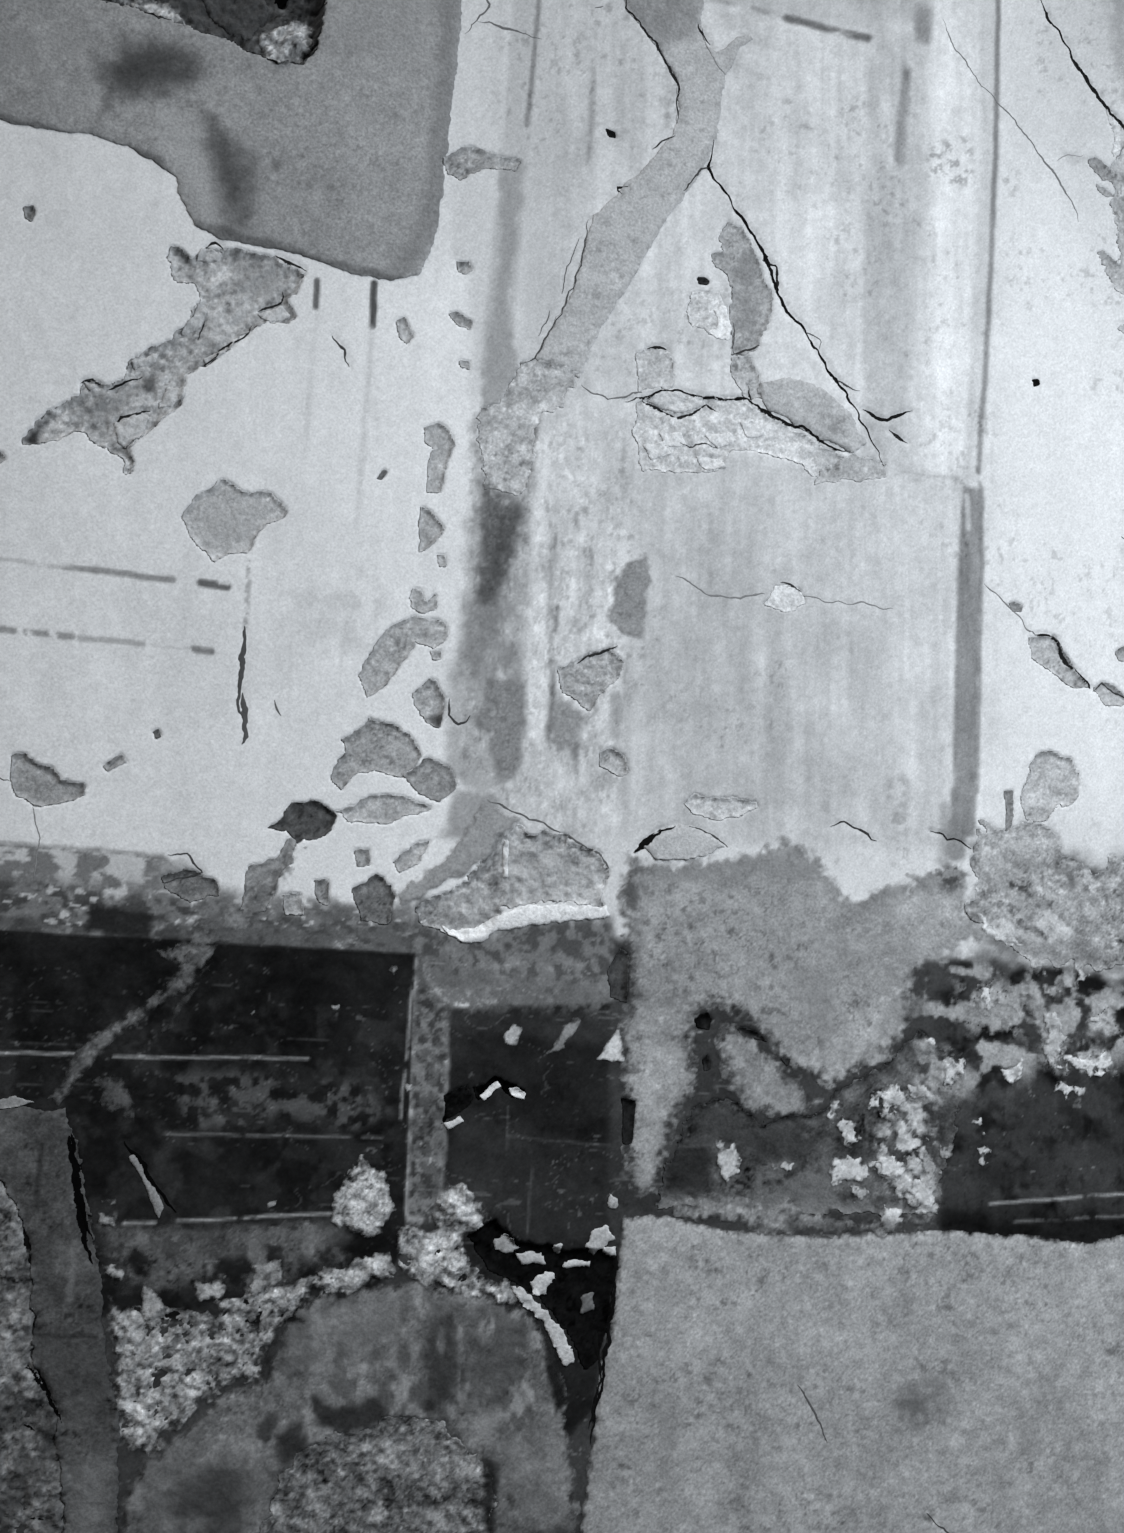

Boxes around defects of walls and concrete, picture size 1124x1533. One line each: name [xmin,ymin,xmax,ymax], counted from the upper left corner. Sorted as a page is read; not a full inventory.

crack [466,0,540,39]
crack [595,0,680,149]
crack [944,0,1124,219]
flaking render [22,241,306,475]
crack [583,140,910,466]
flaking render [632,222,886,485]
crack [236,626,281,744]
water stain [470,485,525,778]
flaking render [240,718,457,924]
water stain [452,793,497,837]
peeling [644,750,1124,1226]
flaking render [99,1157,618,1452]